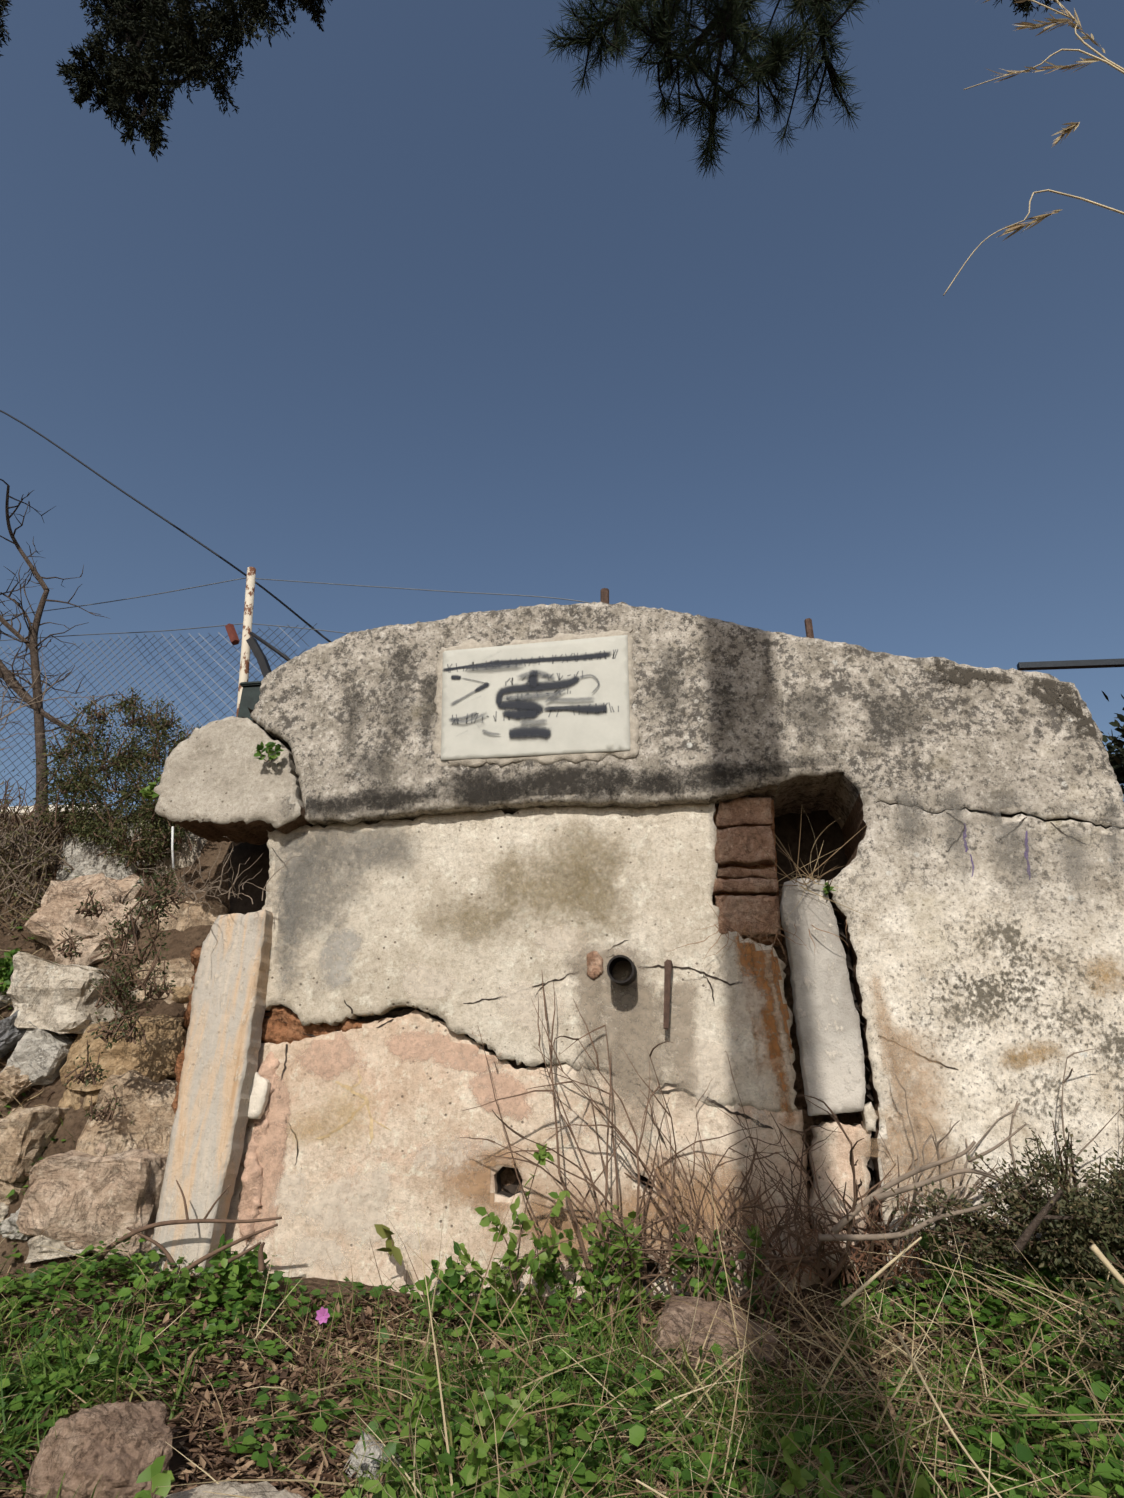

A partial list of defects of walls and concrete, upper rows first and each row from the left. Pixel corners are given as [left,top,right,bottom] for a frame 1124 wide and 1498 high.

damp [461,840,617,932]
crack [876,801,1124,852]
crack [264,940,773,1165]
rust [736,937,793,1122]